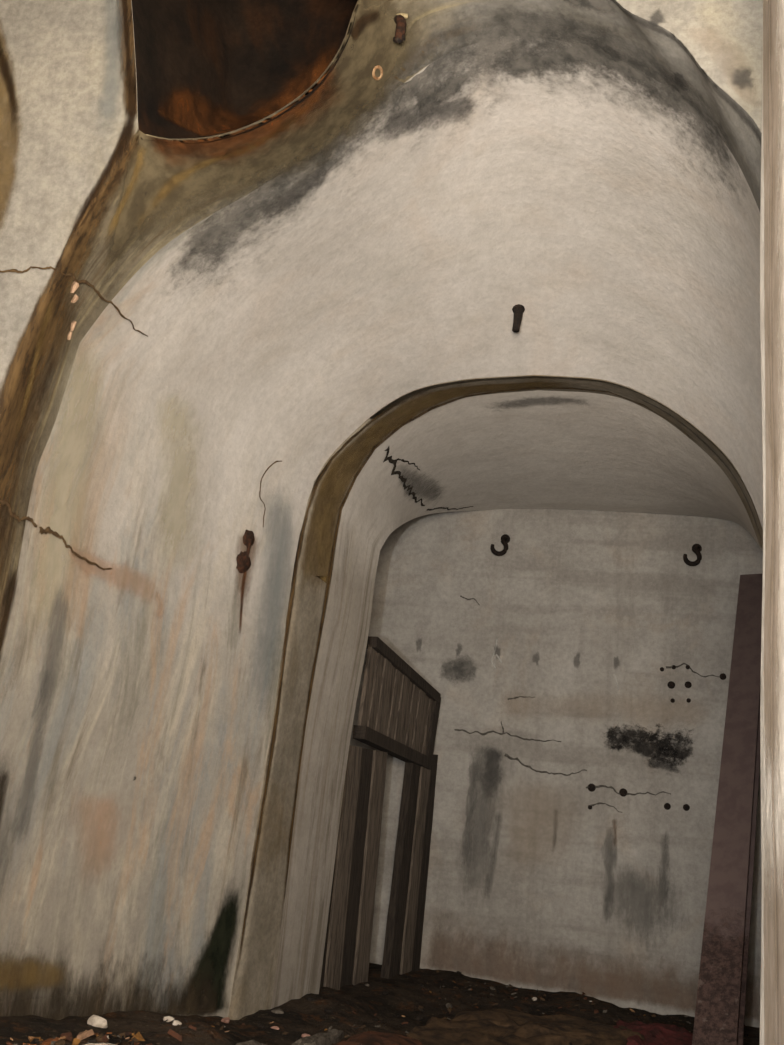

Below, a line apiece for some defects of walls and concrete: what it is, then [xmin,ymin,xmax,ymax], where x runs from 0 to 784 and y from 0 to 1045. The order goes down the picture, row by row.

crack [0,266,148,337]
water stain [0,0,730,651]
crack [383,447,473,511]
crack [0,499,112,570]
water stain [237,0,782,1045]
rust [240,572,248,628]
crack [666,663,720,677]
water stain [20,678,49,829]
crack [454,696,671,813]